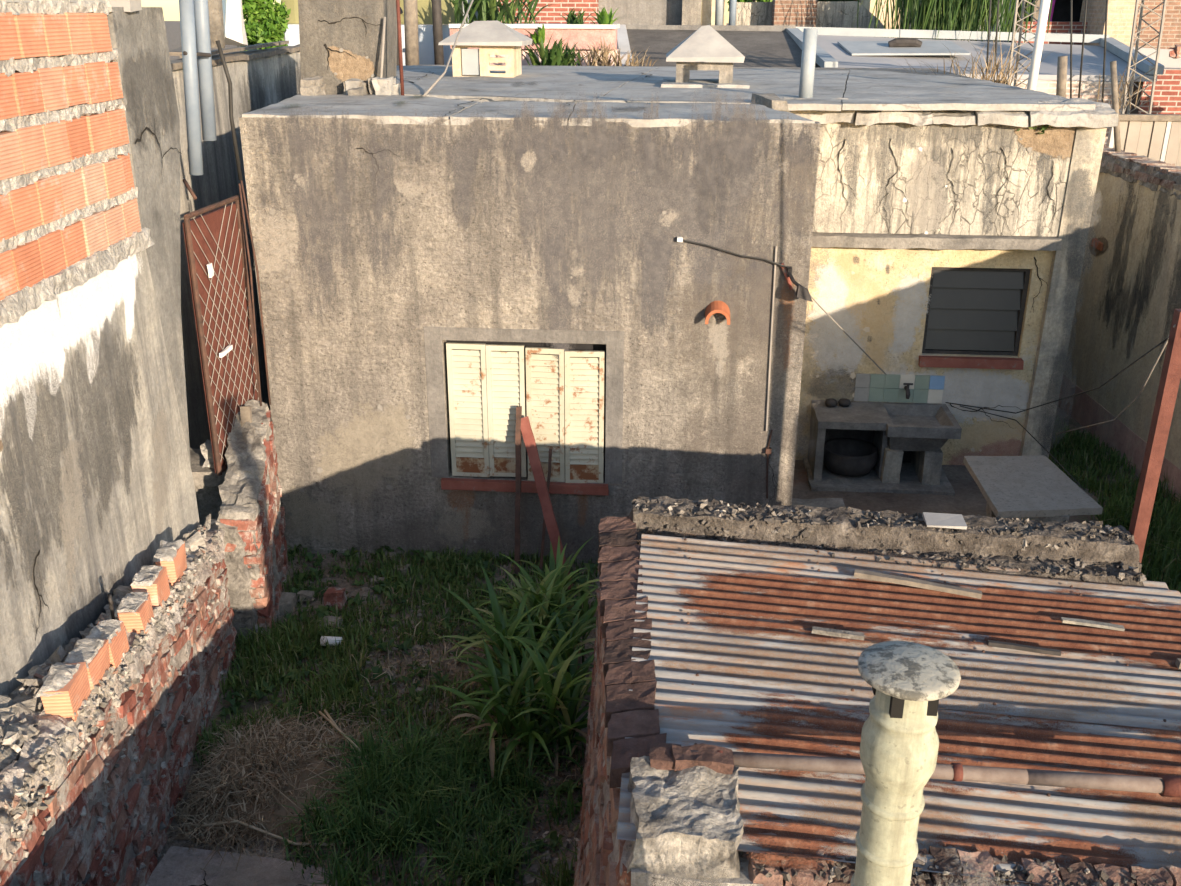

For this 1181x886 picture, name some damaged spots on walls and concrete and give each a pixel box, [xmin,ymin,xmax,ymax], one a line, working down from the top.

crack [318,17,380,70]
spalling [327,46,376,82]
water stain [238,59,1104,507]
peeling [805,257,872,401]
crack [832,139,909,231]
crack [947,147,1061,313]
water stain [1097,160,1181,380]
water stain [0,261,142,645]
spalling [0,525,235,871]
corrosion [631,529,1181,777]
corrosion [742,768,865,873]
corrosion [914,780,1181,879]